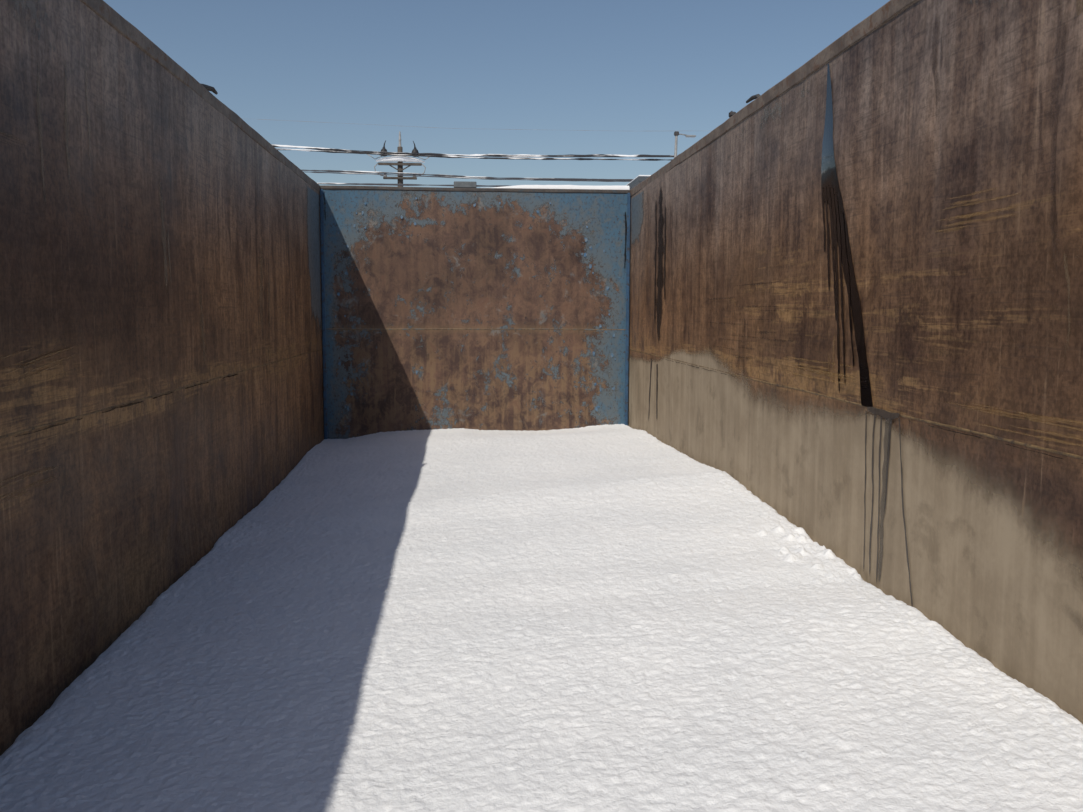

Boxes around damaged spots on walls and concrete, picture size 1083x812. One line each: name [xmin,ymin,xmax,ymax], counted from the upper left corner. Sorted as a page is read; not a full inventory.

damp [654,189,666,339]
damp [821,64,913,607]